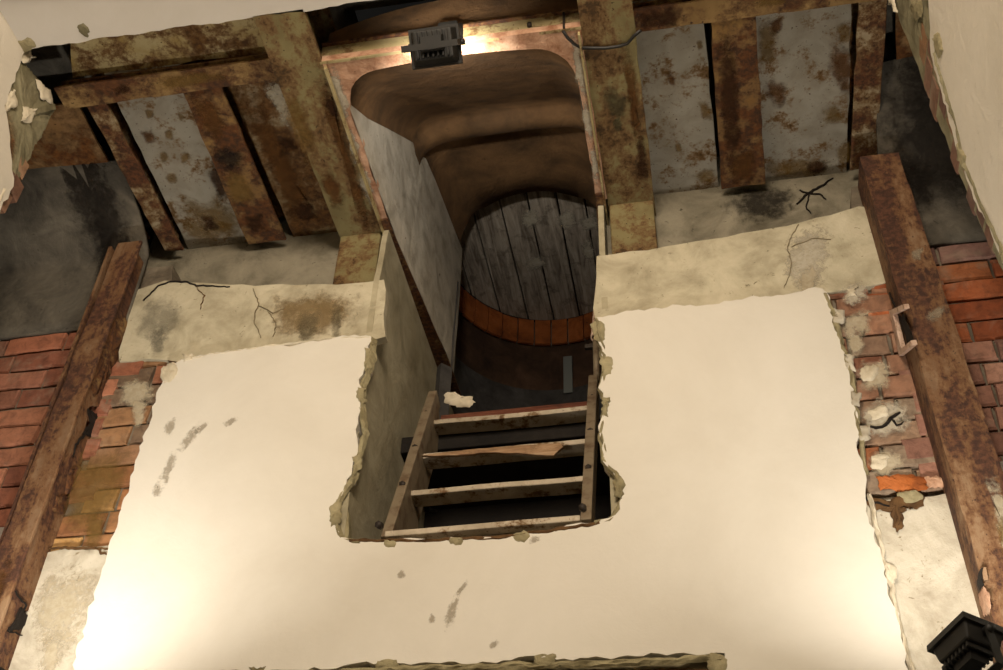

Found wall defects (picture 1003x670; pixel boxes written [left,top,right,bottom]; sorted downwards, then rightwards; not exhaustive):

flaking render [0,37,56,214]
rust [237,94,316,220]
rust [322,84,369,225]
rust [625,61,648,176]
rust [720,45,753,182]
crack [784,178,834,286]
damp [903,162,932,202]
flaking render [888,0,1003,462]
crack [143,280,285,338]
flaking render [51,318,626,552]
flaking render [823,284,944,670]
flaking render [340,653,727,670]